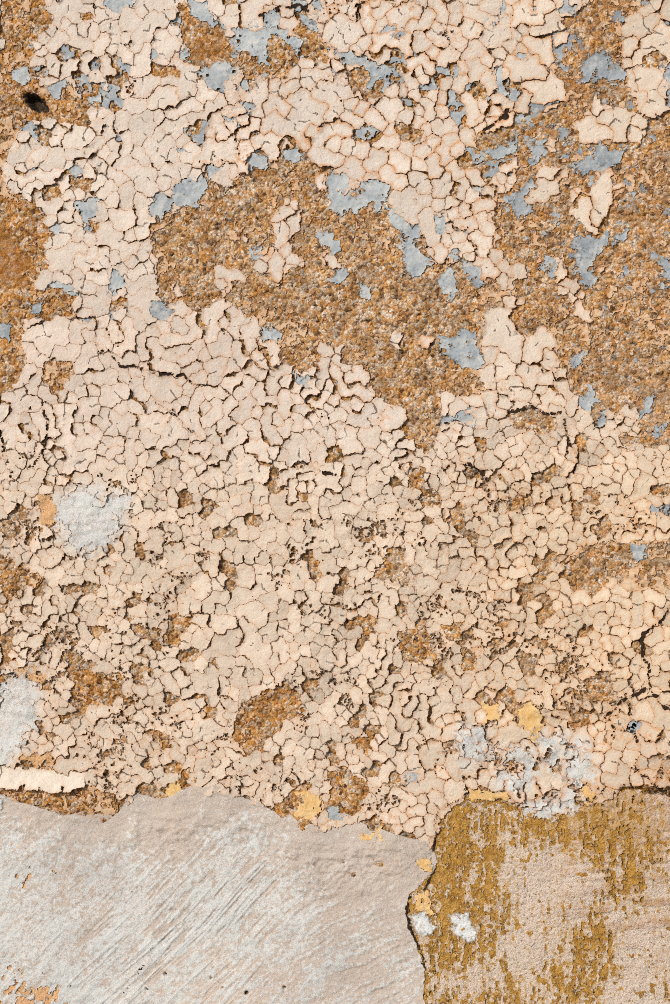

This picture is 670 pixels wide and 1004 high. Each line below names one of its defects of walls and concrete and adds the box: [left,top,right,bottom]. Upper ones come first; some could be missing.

crack [258,3,309,17]
crack [355,1,365,22]
crack [480,108,510,135]
crack [28,398,49,468]
crack [111,356,209,387]
flaking render [0,0,670,689]
crack [507,405,580,484]
peeling [0,543,233,819]
peeling [155,541,458,851]
peeling [381,533,608,820]
peeling [417,417,670,1004]
crack [604,608,670,792]